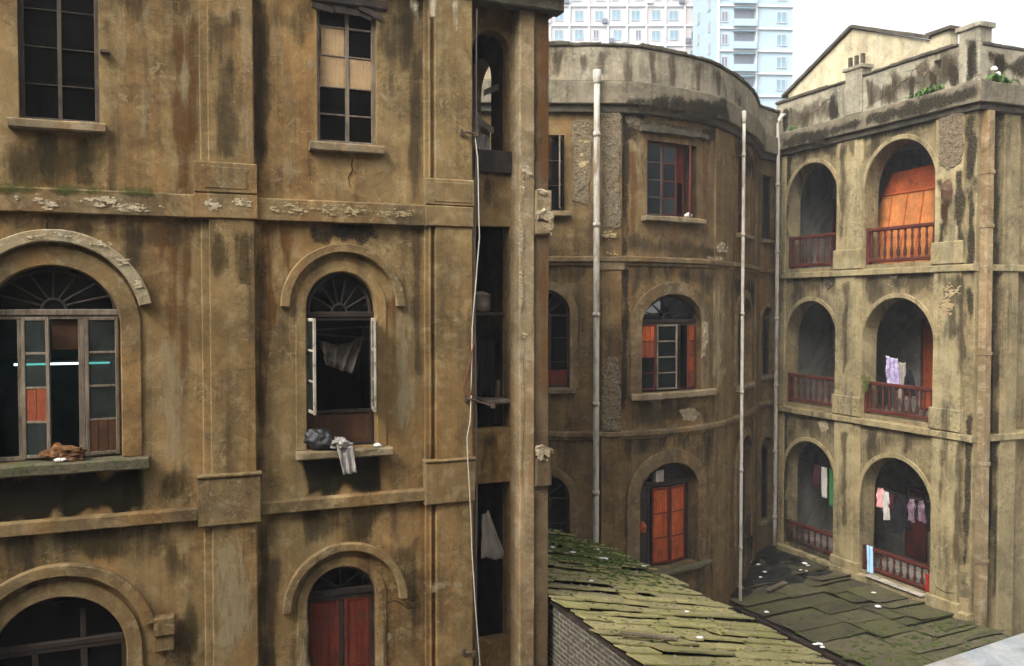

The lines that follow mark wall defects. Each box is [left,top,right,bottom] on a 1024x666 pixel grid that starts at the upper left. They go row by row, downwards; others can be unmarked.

peeling [32,193,58,210]
peeling [80,195,164,212]
peeling [204,198,252,211]
leakage [210,3,279,194]
peeling [269,202,412,217]
flaking render [570,112,701,255]
leakage [549,39,1024,387]
flaking render [938,113,965,170]
leakage [621,267,706,456]
leakage [0,470,143,522]
leakage [954,414,973,565]
leakage [989,401,999,596]